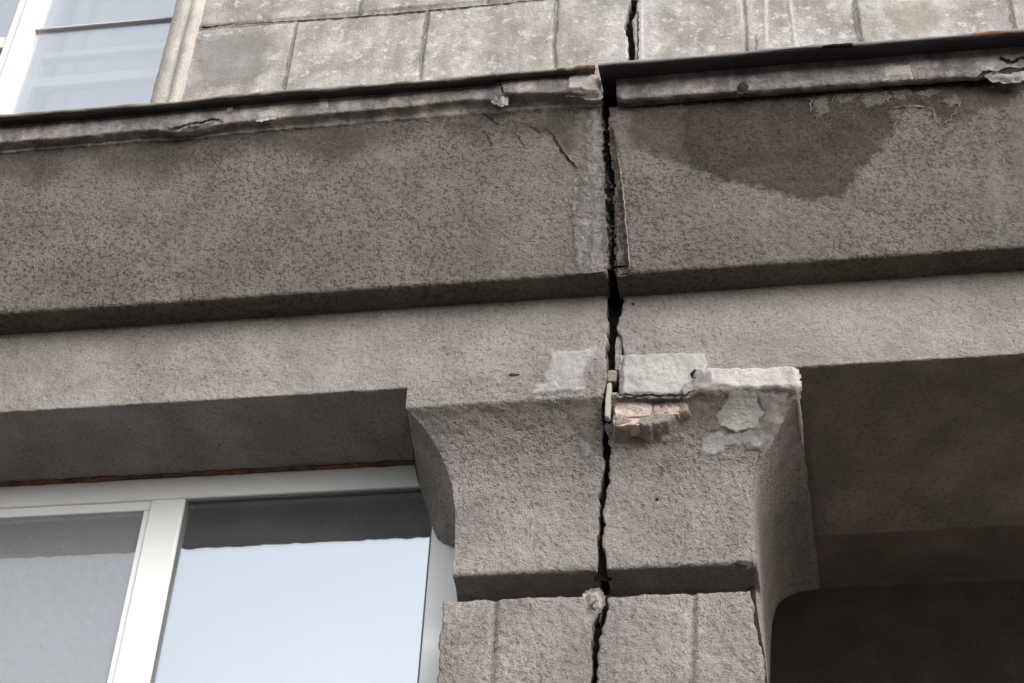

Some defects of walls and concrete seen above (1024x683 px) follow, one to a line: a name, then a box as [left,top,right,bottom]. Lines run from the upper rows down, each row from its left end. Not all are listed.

crack [626,1,639,60]
spalling [491,72,509,107]
spalling [977,56,1024,84]
crack [483,113,577,169]
leakage [629,78,1014,201]
peeling [532,349,595,393]
crack [592,92,628,683]
spalling [610,366,804,497]
spalling [582,588,605,614]